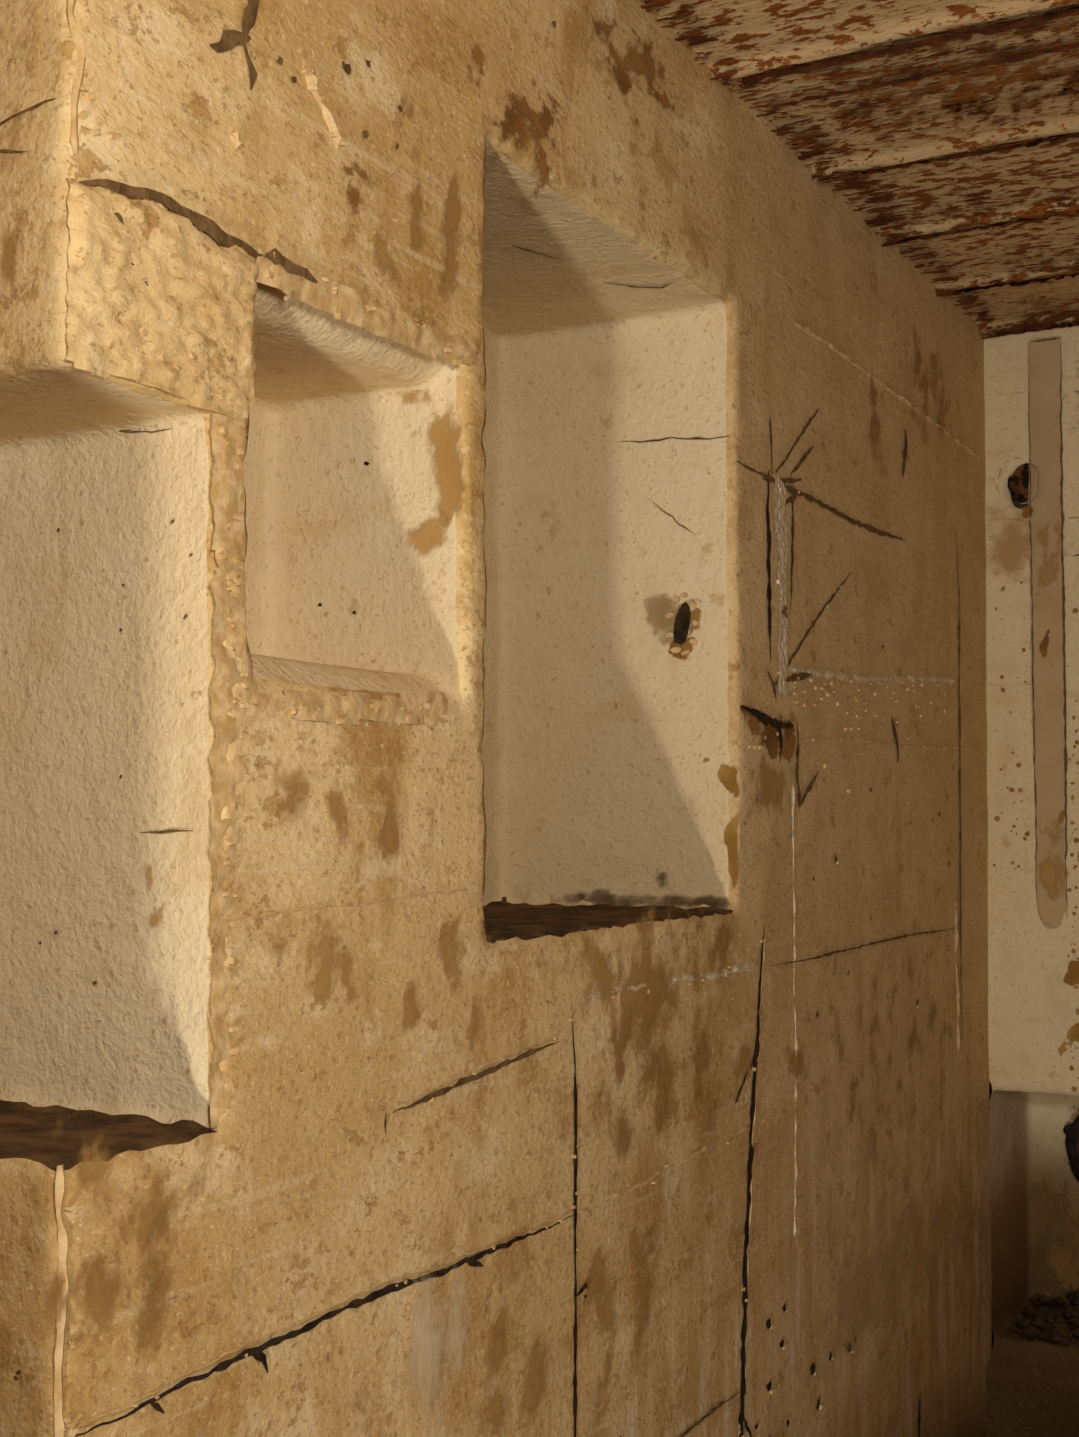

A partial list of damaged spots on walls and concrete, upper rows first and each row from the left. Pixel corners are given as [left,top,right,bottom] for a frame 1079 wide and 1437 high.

peeling [403,390,429,402]
peeling [408,413,463,554]
spalling [646,593,701,660]
spalling [209,410,448,1128]
crack [140,827,194,835]
crack [679,528,962,1437]
peeling [1064,958,1079,986]
peeling [1058,1023,1079,1056]
crack [64,1011,588,1437]